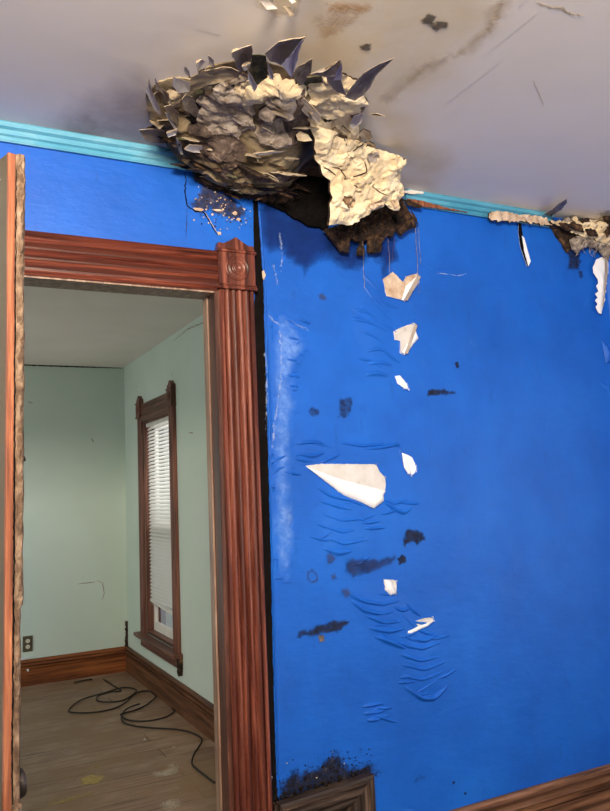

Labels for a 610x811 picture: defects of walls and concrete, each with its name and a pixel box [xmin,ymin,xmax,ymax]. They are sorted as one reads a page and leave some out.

peeling [259,0,298,17]
damp [196,0,535,195]
flaking render [139,34,467,288]
flaking render [488,199,610,260]
damp [347,555,406,574]
damp [404,530,425,545]